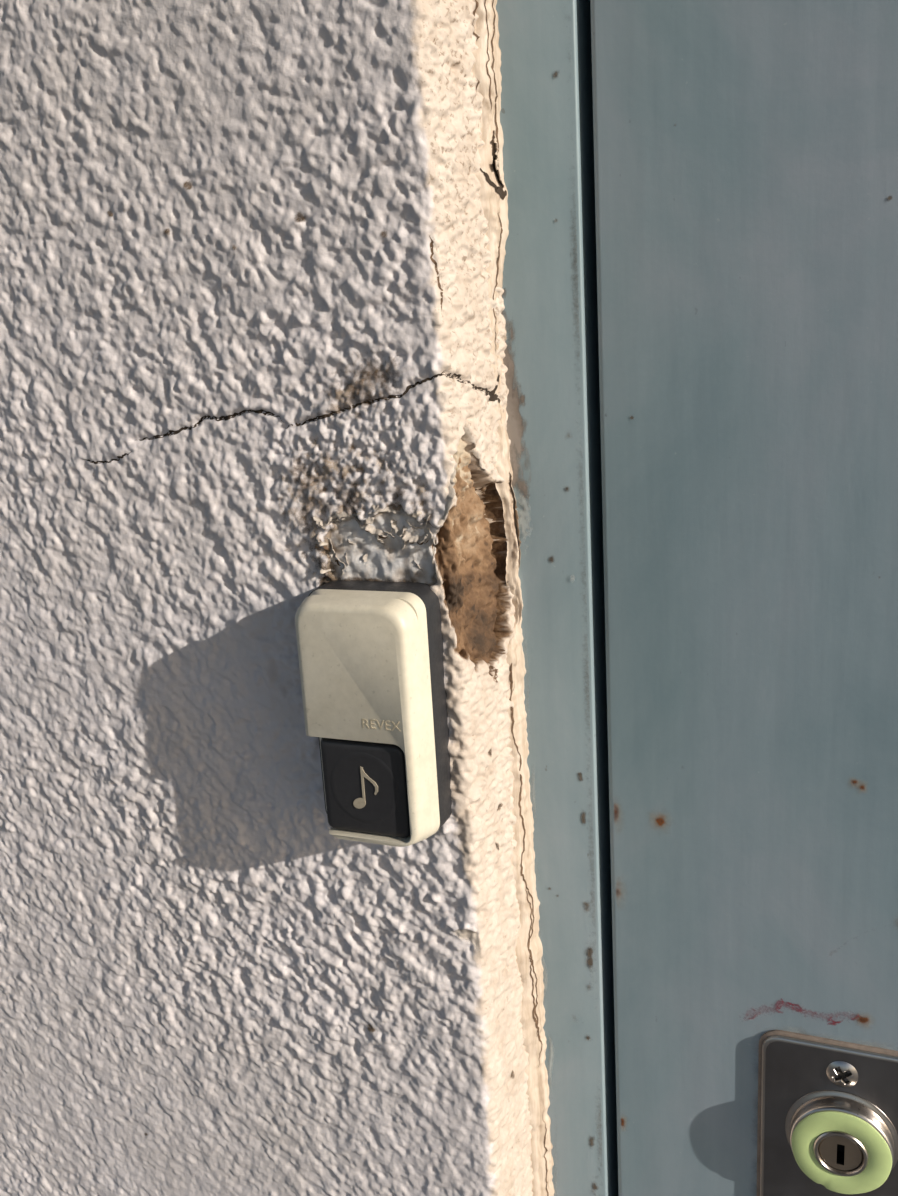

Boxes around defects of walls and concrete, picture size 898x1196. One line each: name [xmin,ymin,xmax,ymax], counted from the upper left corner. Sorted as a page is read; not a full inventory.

crack [83,371,500,464]
spalling [313,426,506,683]